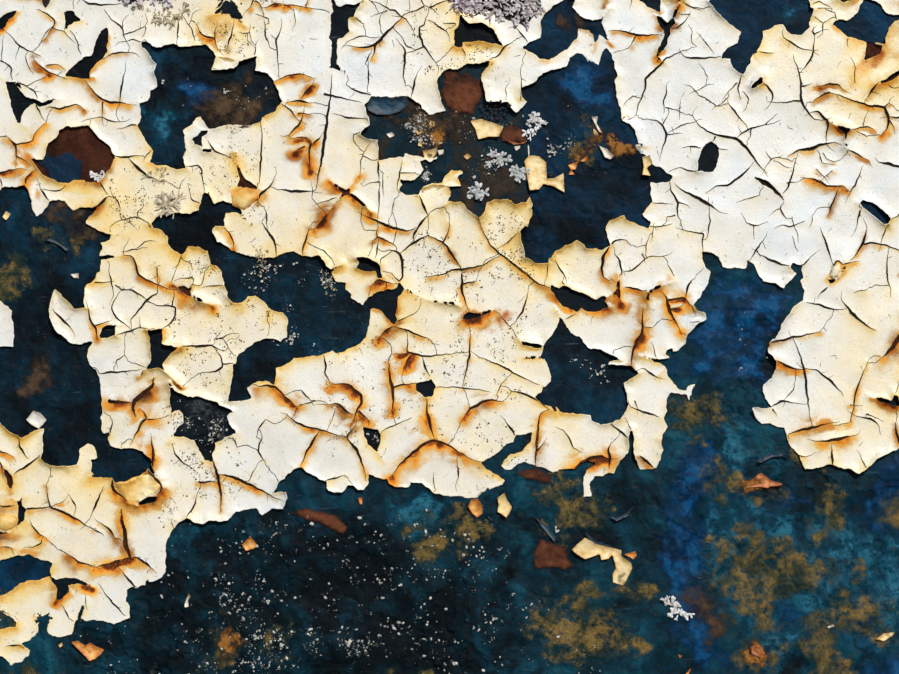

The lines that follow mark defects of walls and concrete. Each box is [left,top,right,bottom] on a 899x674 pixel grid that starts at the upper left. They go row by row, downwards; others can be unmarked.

crack [0,434,151,621]
peeling [0,185,155,483]
peeling [138,42,282,169]
peeling [152,193,412,462]
corrosion [285,113,376,238]
corrosion [323,381,375,432]
crack [53,0,659,527]
corrosion [383,348,483,487]
peeling [0,252,899,674]
peeling [361,0,672,263]
corrosion [547,274,697,368]
crack [599,0,899,465]